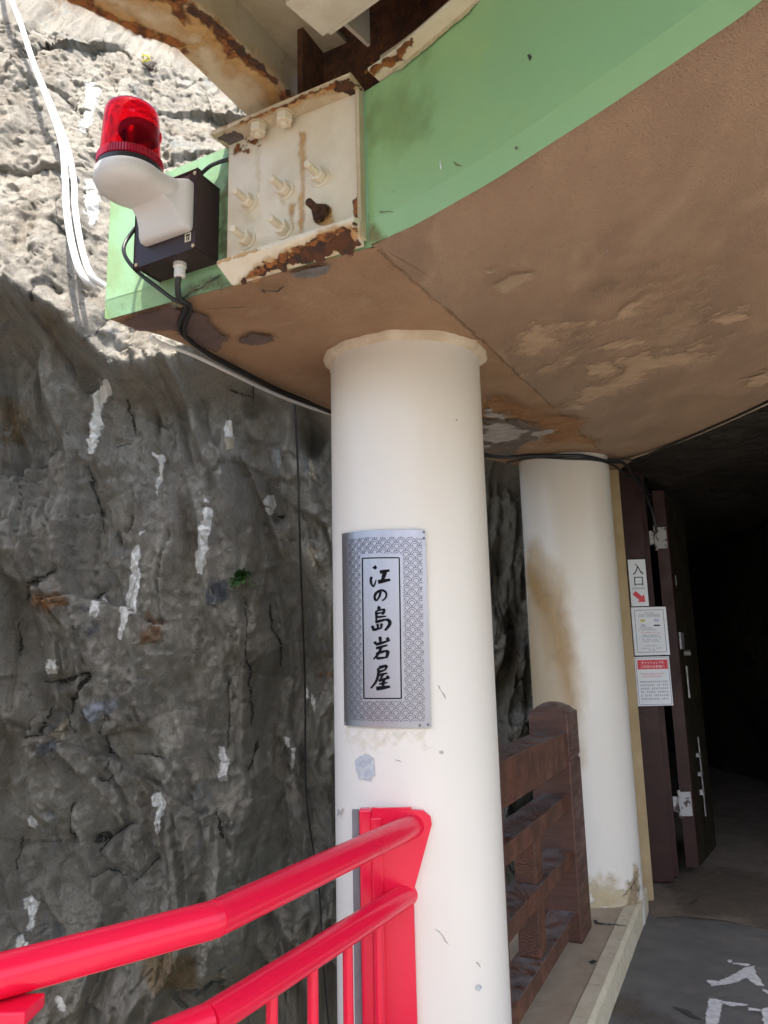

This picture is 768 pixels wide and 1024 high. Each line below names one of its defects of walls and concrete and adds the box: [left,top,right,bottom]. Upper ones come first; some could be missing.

rust [67,0,363,124]
rust [364,38,413,76]
rust [233,138,261,155]
rust [217,194,380,285]
peeling [120,305,273,352]
peeling [512,291,715,410]
spalling [482,419,549,456]
peeling [355,754,375,781]
water stain [589,866,642,908]